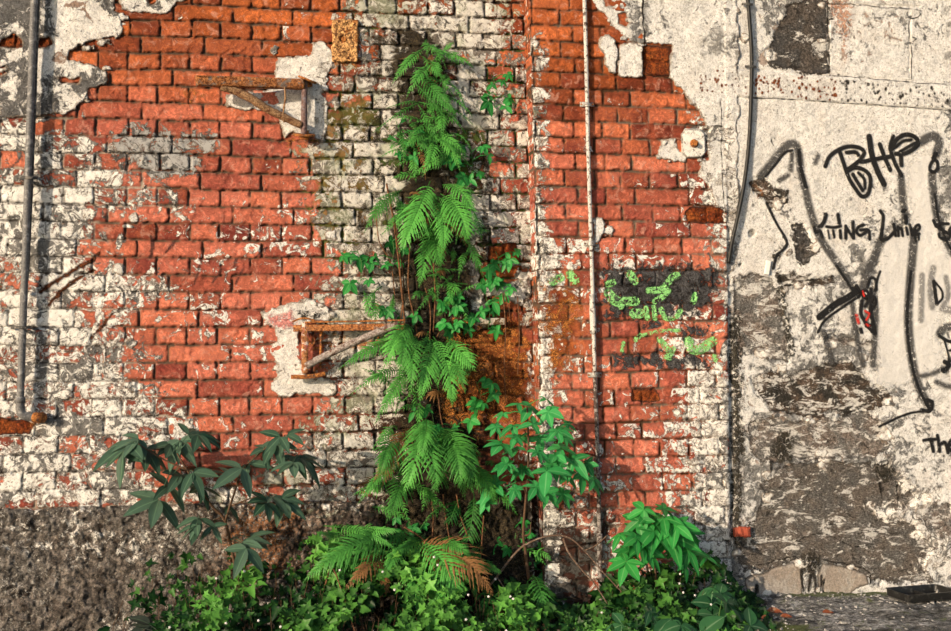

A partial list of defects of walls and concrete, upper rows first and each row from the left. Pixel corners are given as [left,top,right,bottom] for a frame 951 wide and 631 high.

peeling [0,0,571,523]
peeling [525,474,572,604]
spalling [592,0,951,596]